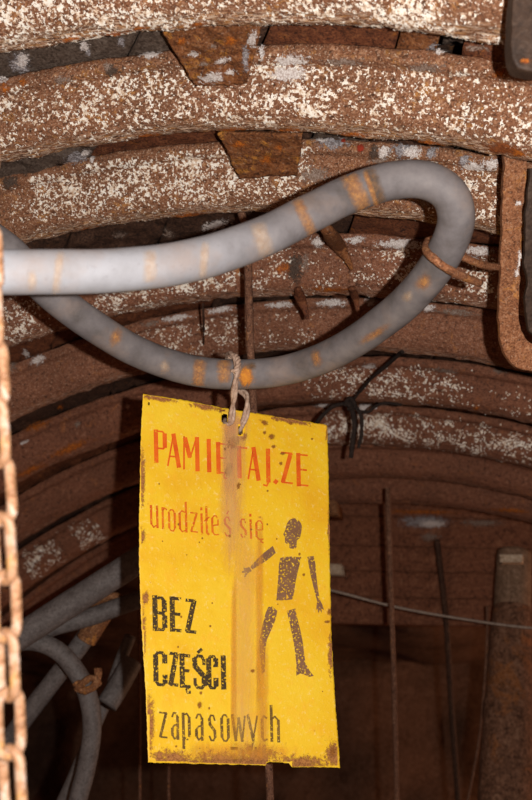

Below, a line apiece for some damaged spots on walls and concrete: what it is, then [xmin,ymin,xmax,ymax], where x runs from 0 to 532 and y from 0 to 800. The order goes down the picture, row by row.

efflorescence [0,51,32,83]
efflorescence [56,148,95,167]
rust [484,142,526,156]
efflorescence [199,218,234,235]